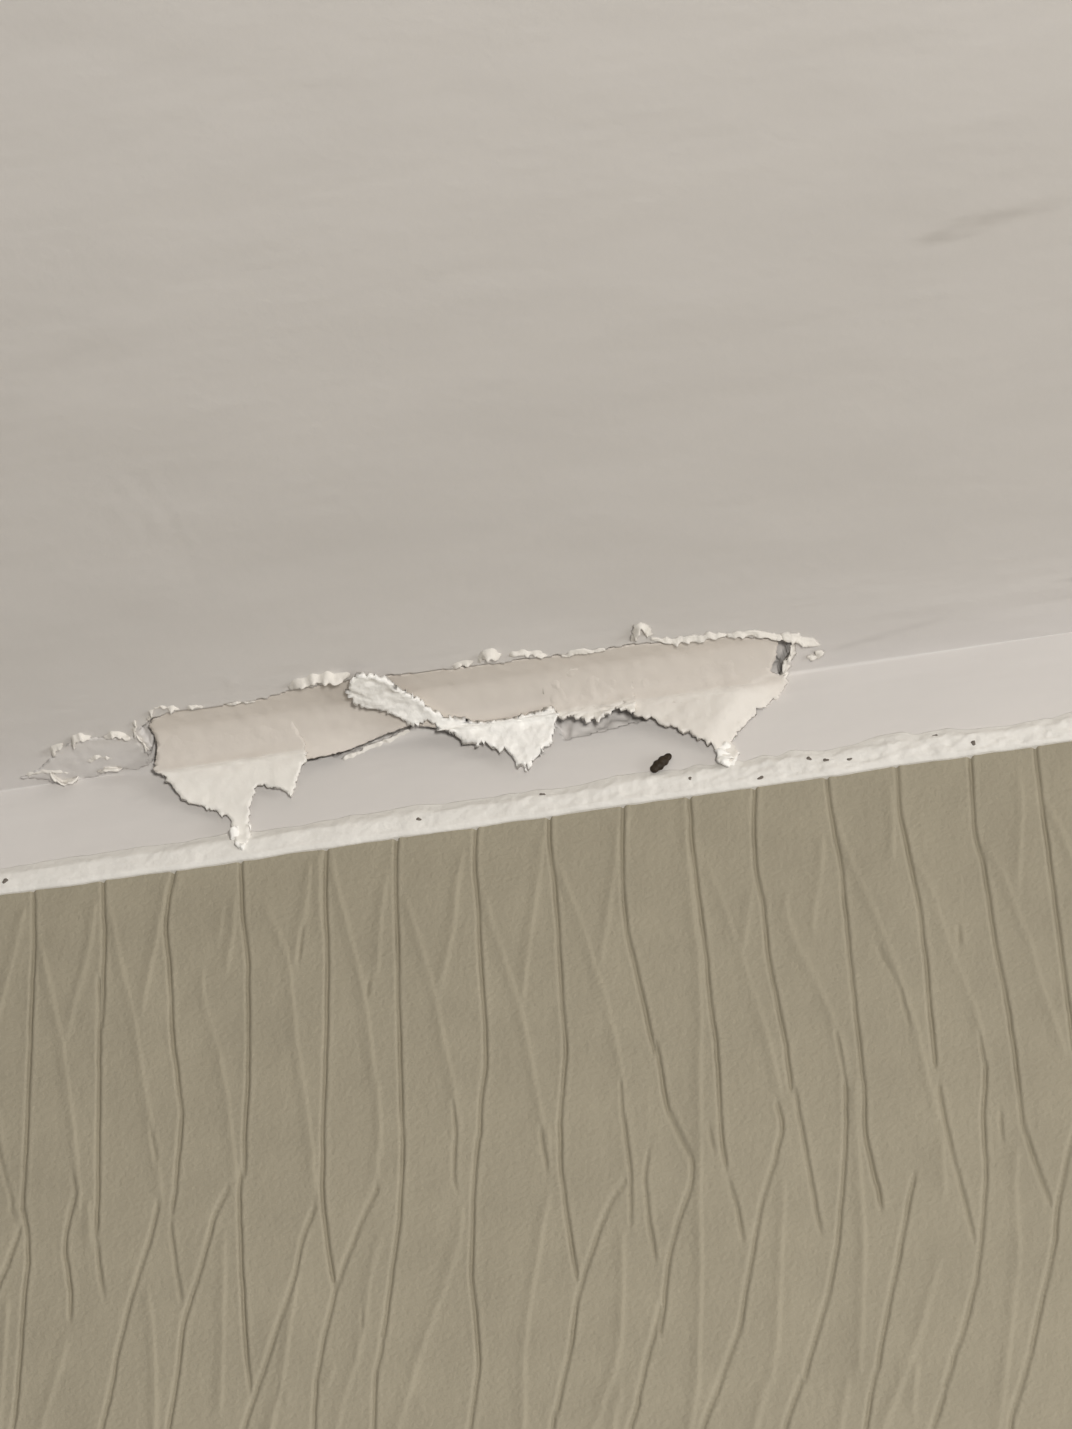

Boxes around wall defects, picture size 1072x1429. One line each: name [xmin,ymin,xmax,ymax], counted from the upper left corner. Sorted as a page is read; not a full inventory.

peeling [21,623,825,850]